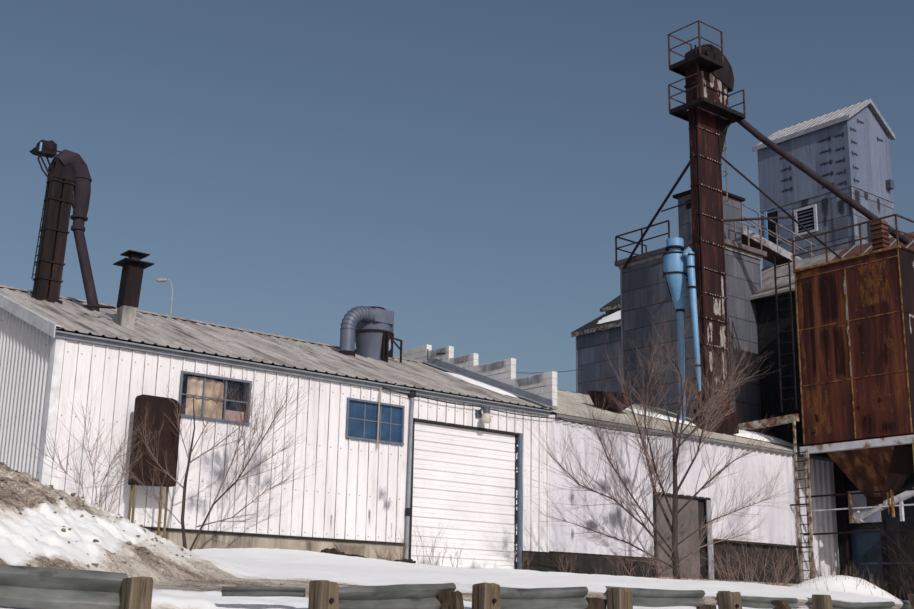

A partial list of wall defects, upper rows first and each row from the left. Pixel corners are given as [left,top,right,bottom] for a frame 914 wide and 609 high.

rust [799,269,846,376]